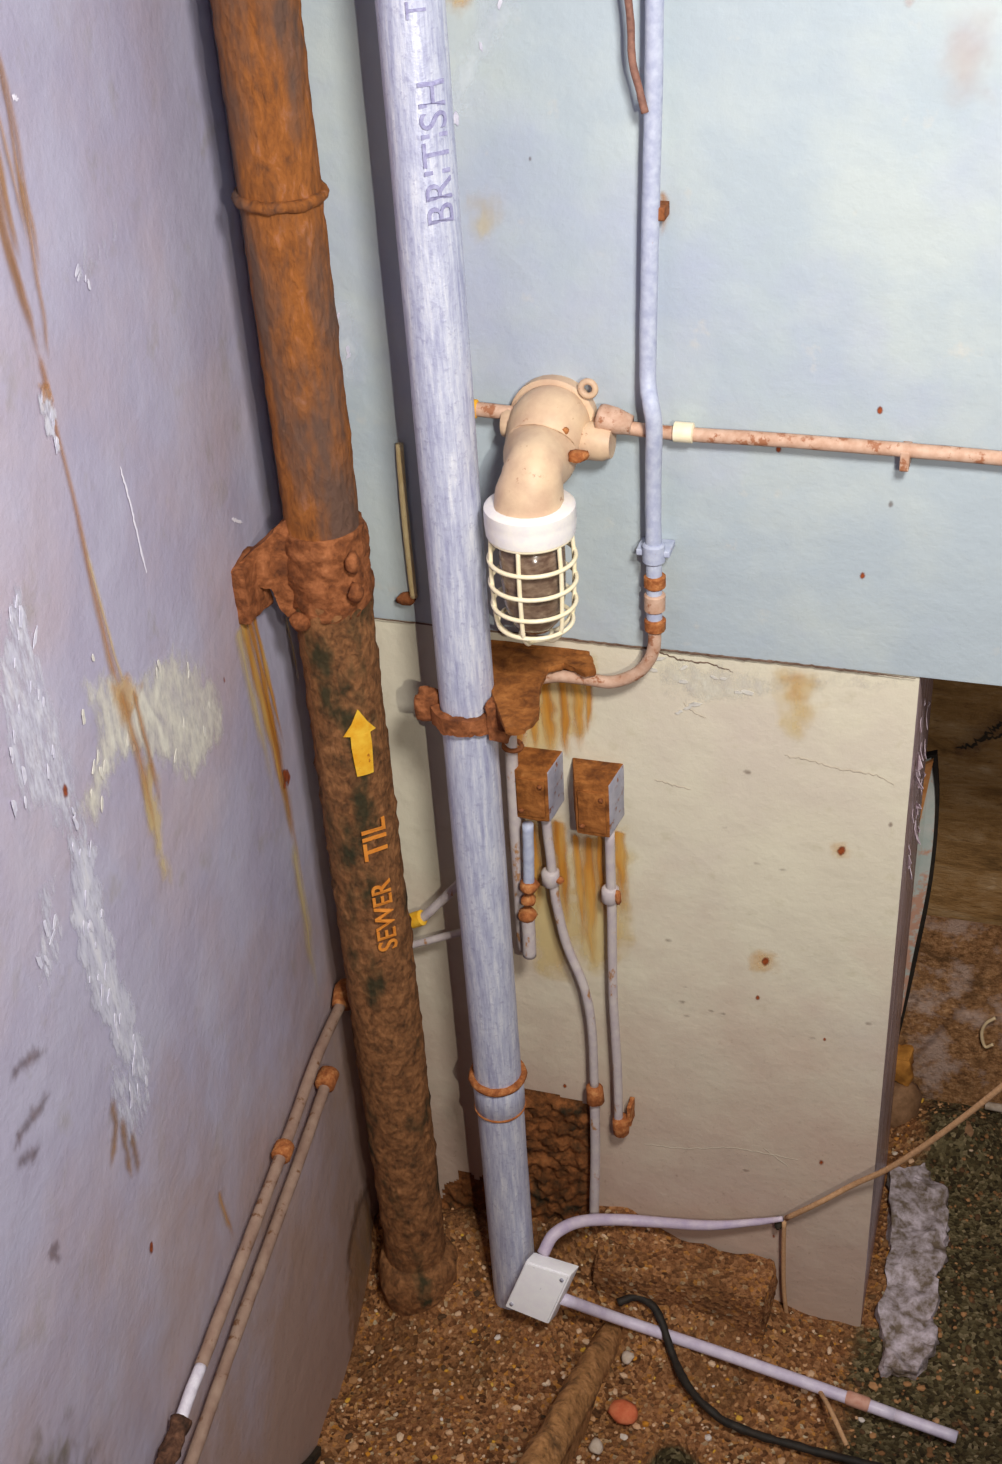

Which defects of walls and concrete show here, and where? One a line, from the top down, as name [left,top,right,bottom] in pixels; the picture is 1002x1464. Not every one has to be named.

corrosion [0,63,44,312]
corrosion [42,366,159,840]
corrosion [238,618,290,811]
corrosion [517,682,592,747]
corrosion [521,821,626,963]